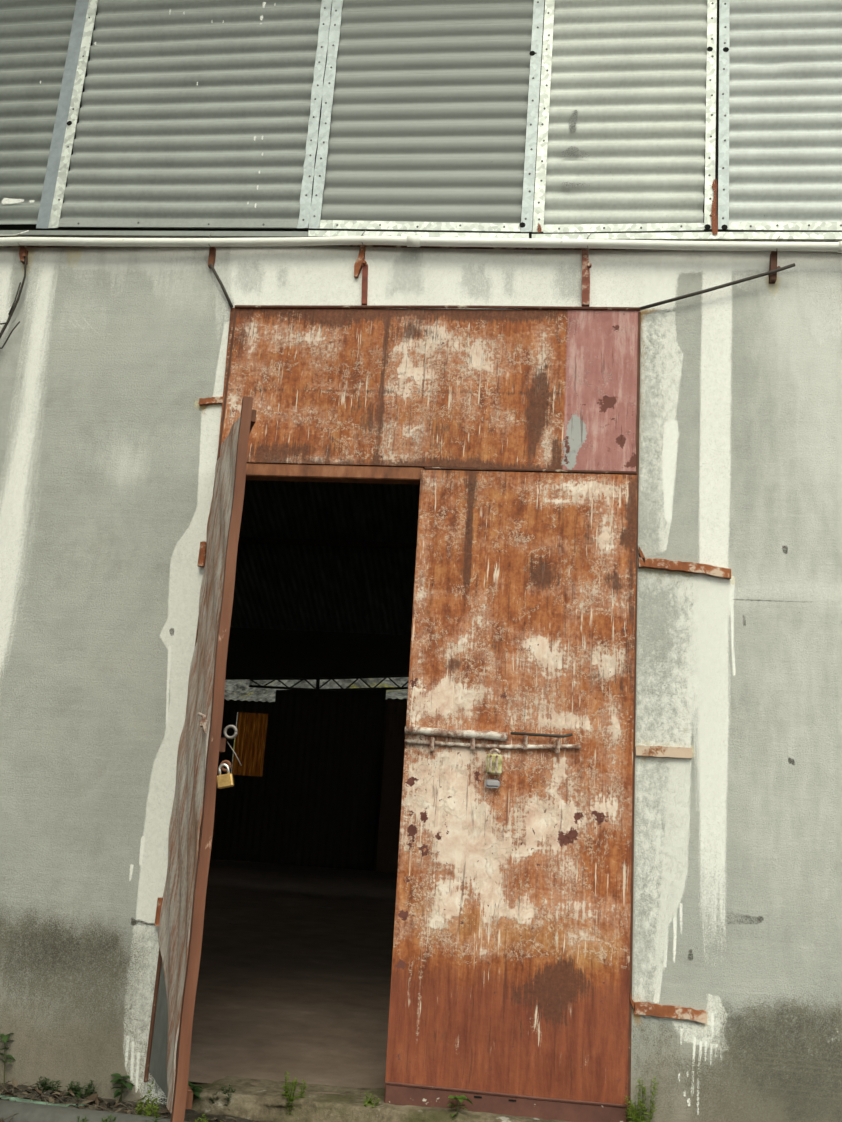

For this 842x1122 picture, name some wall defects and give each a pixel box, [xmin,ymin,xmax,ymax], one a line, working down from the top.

damp [210,247,233,343]
damp [0,247,196,699]
damp [0,897,150,1099]
damp [631,991,842,1122]